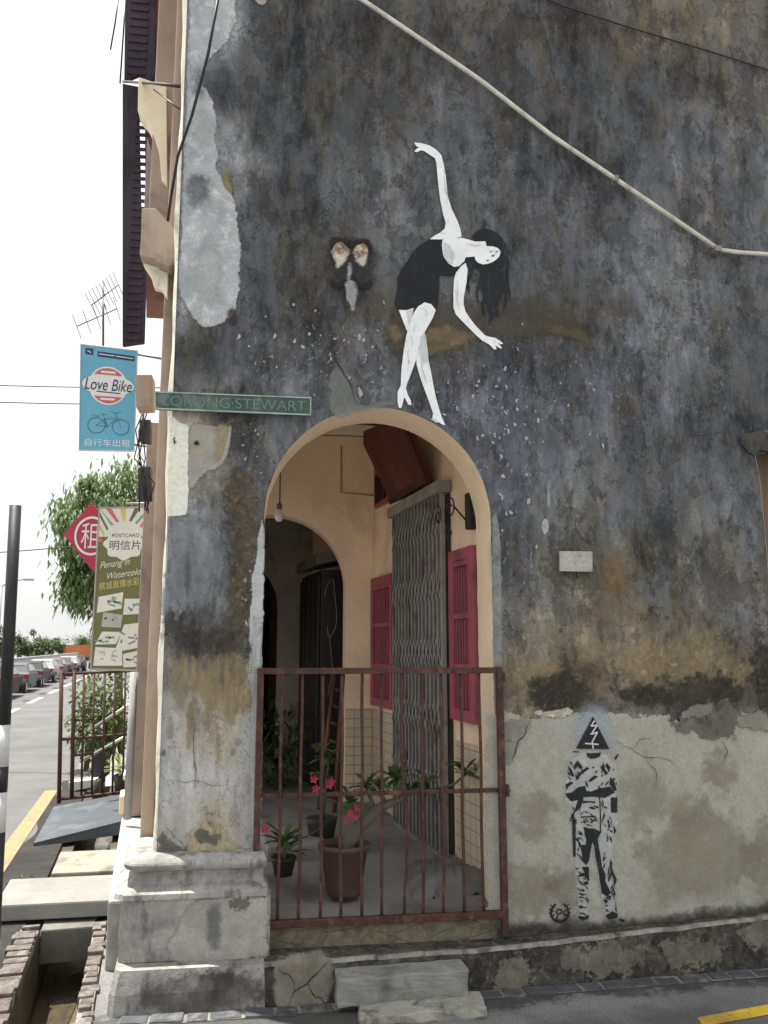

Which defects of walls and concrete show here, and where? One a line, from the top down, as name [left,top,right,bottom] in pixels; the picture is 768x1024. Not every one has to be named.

flaking render [178,0,242,327]
flaking render [188,423,259,489]
damp [161,614,257,767]
damp [513,641,768,716]
crack [181,732,222,786]
flaking render [504,707,573,764]
crack [618,737,678,782]
flaking render [668,697,768,763]
crack [273,950,334,1007]